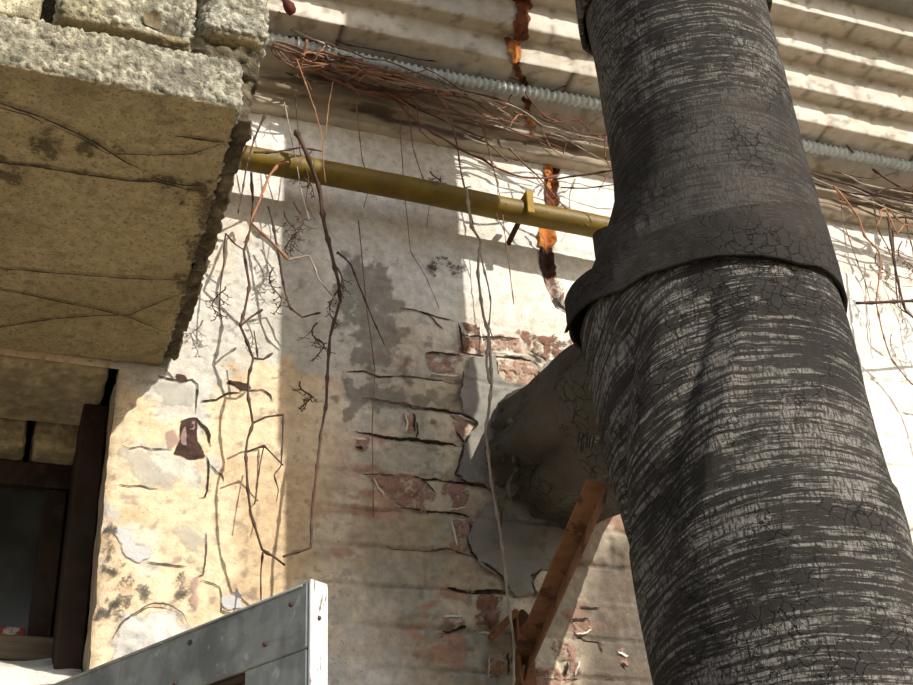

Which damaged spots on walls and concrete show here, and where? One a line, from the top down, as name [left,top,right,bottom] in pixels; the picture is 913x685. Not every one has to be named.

crack [504,0,536,135]
crack [0,103,228,192]
crack [544,164,560,207]
crack [0,268,192,333]
crack [538,228,565,311]
spalling [426,322,573,385]
spalling [166,417,211,459]
damp [92,522,150,620]
damp [176,571,191,600]
peeling [221,591,243,610]
spalling [438,590,506,637]
spalling [536,615,592,685]